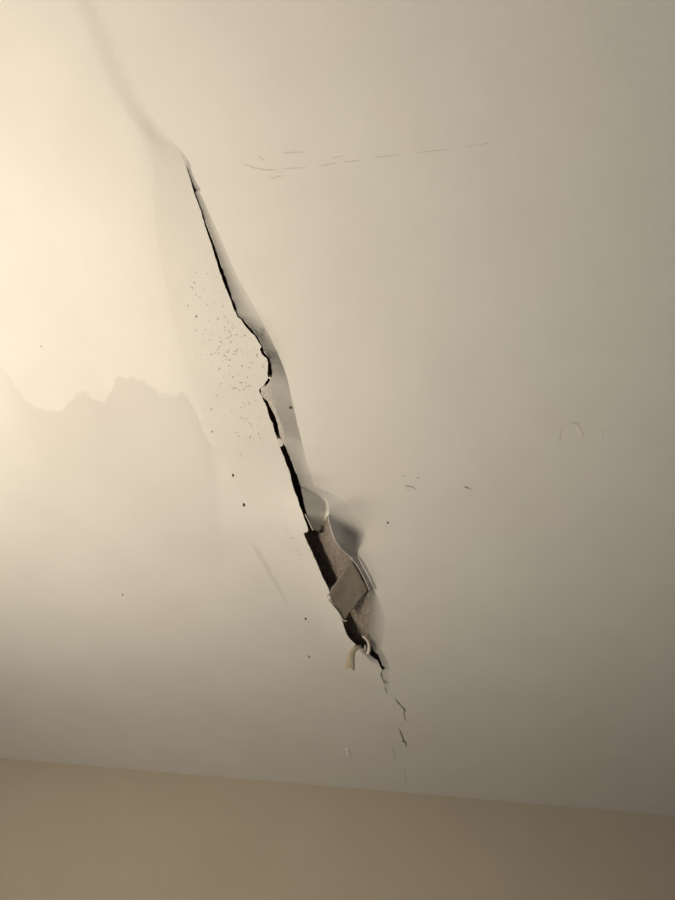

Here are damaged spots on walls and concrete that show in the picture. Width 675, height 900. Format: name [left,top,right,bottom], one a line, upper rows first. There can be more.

crack [187,169,321,533]
flaking render [304,514,373,671]
crack [370,650,406,743]